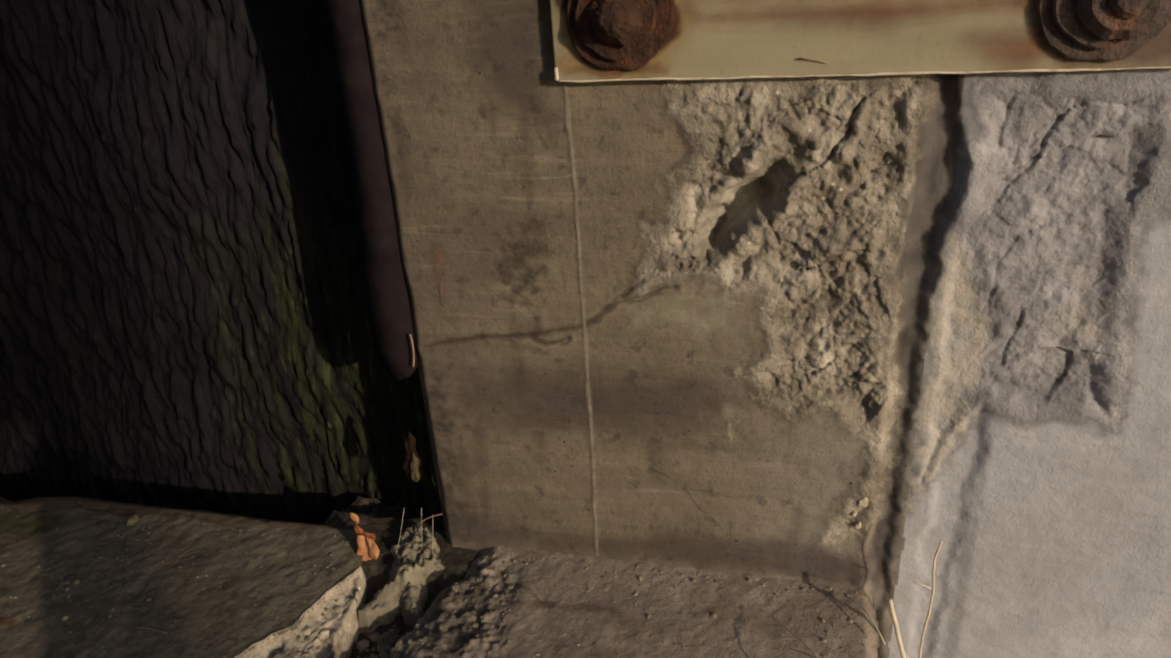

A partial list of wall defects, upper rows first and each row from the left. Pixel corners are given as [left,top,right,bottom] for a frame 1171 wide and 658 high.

corrosion [582,0,683,74]
corrosion [1068,22,1171,65]
spalling [632,70,1171,550]